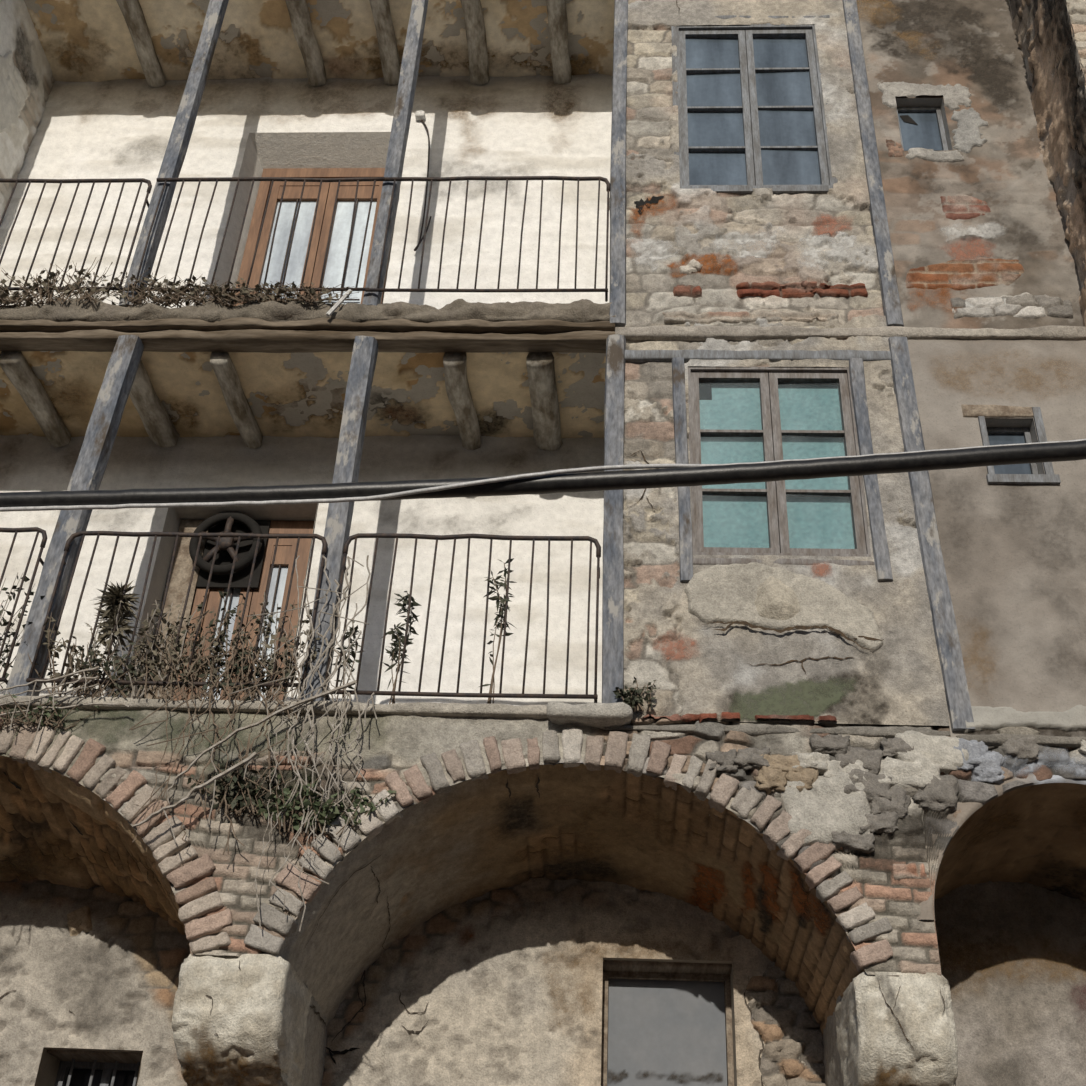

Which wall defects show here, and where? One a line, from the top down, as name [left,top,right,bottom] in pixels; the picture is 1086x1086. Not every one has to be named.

leakage [870,0,1017,107]
flaking render [940,194,1005,238]
flaking render [905,257,1073,320]
crack [702,621,884,673]
leakage [826,674,888,724]
crack [305,852,390,949]
crack [310,970,367,1043]
crack [399,993,429,1033]
crack [878,980,914,1049]